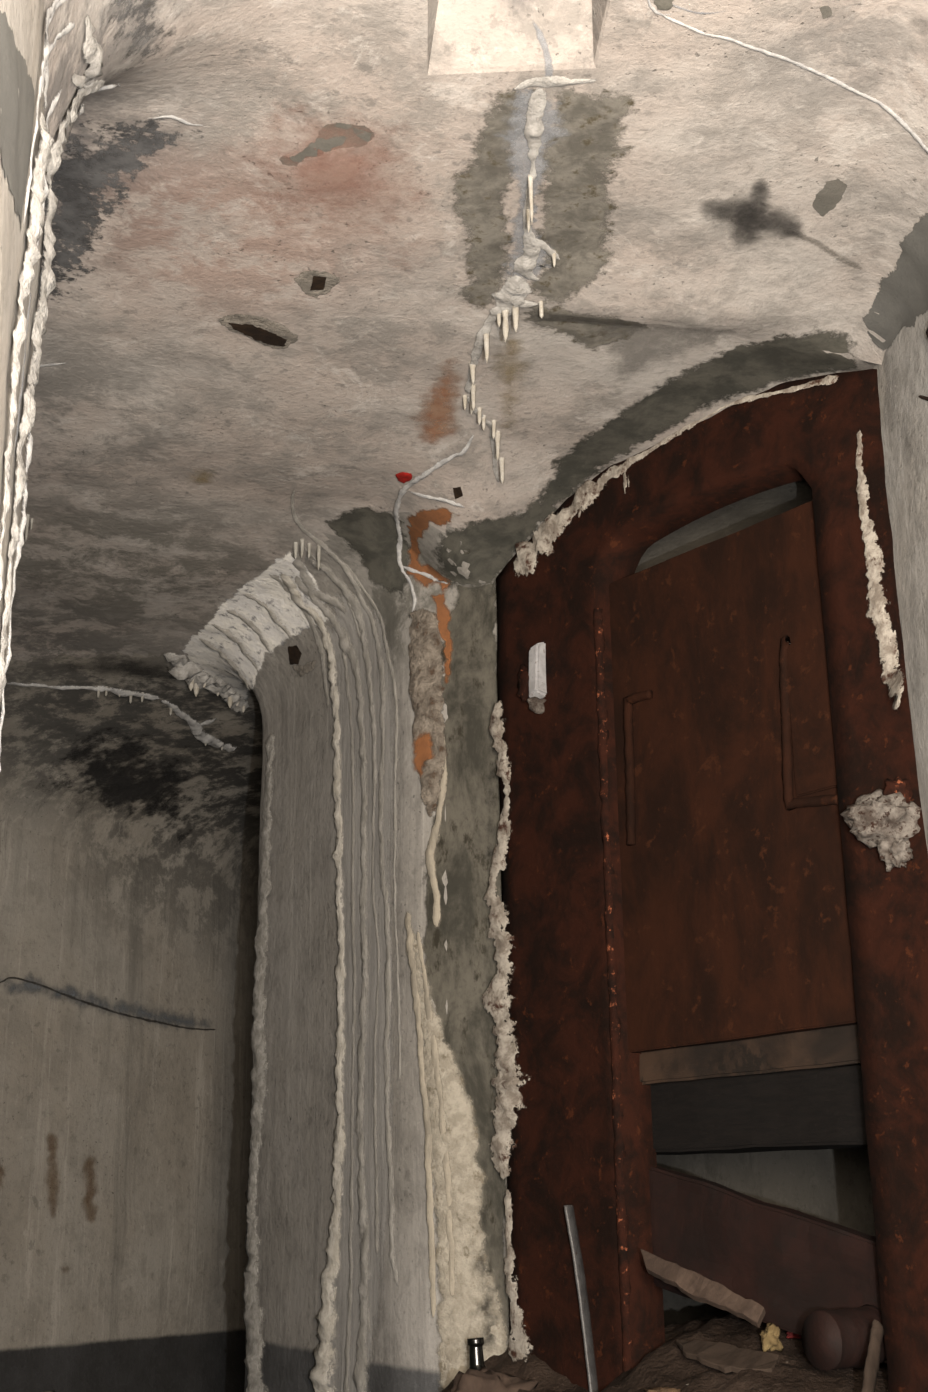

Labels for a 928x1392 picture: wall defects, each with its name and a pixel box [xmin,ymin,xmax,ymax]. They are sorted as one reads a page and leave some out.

damp [0,0,237,772]
spalling [219,314,298,349]
peeling [325,507,411,595]
damp [453,25,720,484]
peeling [434,330,857,597]
peeling [855,431,905,710]
peeling [863,213,928,350]
damp [53,728,193,821]
spalling [408,608,448,927]
damp [9,977,206,1026]
crack [0,977,215,1030]
damp [163,490,510,1392]